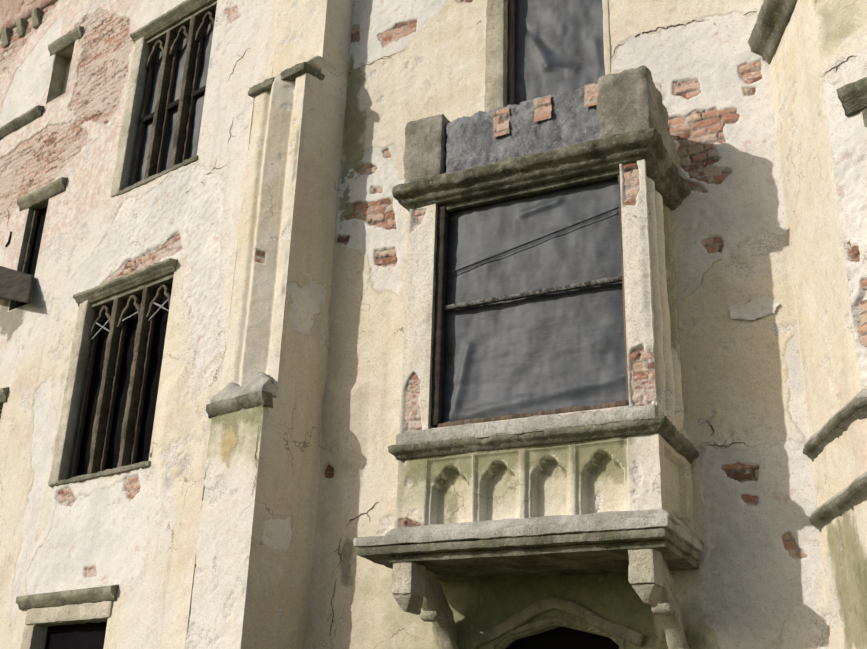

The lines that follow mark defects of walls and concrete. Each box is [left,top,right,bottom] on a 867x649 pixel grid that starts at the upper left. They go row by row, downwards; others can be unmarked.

peeling [349,0,473,70]
spalling [0,0,134,223]
peeling [335,145,427,296]
peeling [611,11,786,296]
peeling [823,81,867,387]
spalling [404,373,422,432]
spalling [630,348,657,406]
crack [705,420,748,447]
peeling [700,326,822,649]
crack [330,502,378,636]
leakage [828,511,867,648]